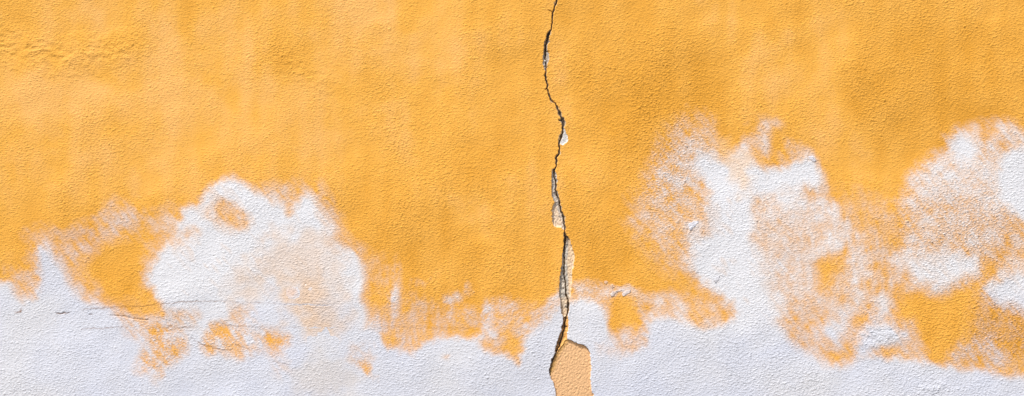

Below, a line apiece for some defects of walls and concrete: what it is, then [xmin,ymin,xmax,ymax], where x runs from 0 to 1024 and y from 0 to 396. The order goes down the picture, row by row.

peeling [0,102,1024,396]
crack [544,0,570,375]